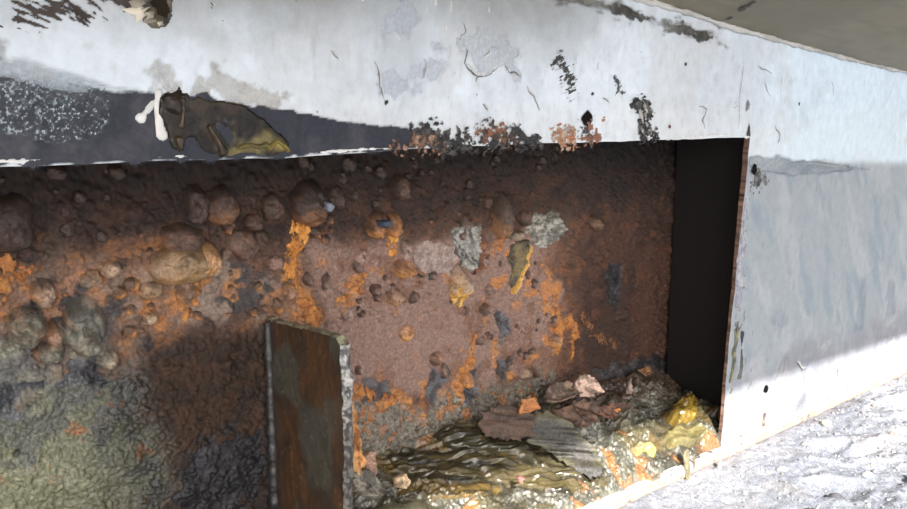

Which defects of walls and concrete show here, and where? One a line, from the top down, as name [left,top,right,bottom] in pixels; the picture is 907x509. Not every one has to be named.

corrosion [45,165,69,194]
corrosion [96,117,581,338]
corrosion [0,190,120,370]
corrosion [535,295,620,360]
corrosion [355,365,398,414]
corrosion [428,331,494,389]
corrosion [506,347,544,379]
corrosion [477,366,654,441]
corrosion [362,451,378,474]